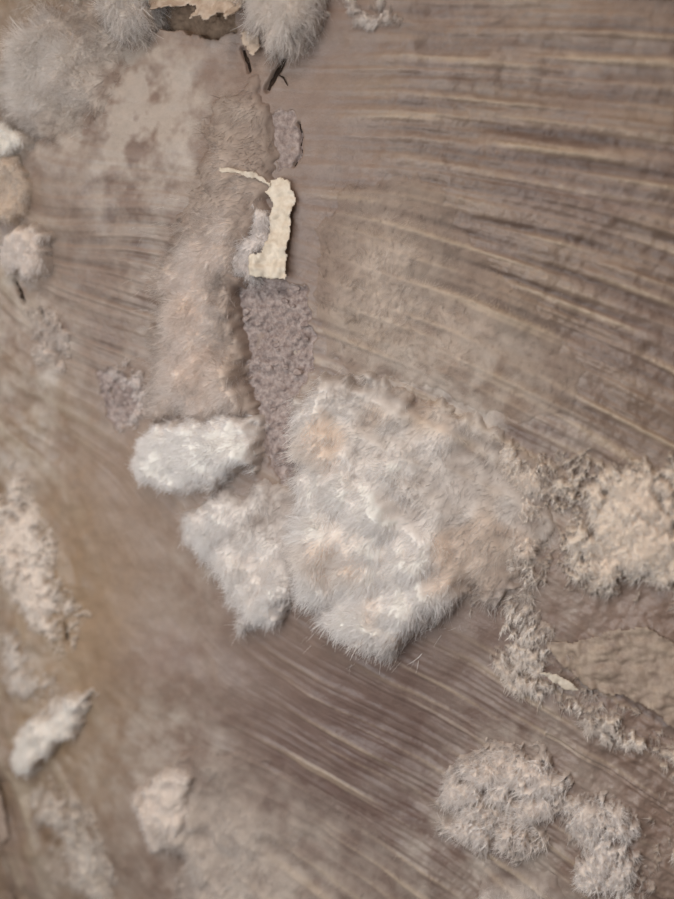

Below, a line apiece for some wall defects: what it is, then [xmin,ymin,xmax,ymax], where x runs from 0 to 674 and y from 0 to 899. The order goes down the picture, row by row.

spalling [148,0,260,56]
leakage [230,0,332,72]
leakage [0,0,172,284]
leakage [24,291,74,374]
spalling [239,278,317,485]
leakage [105,74,674,799]
leakage [0,457,118,899]
peeling [540,627,674,728]
leakage [123,739,433,899]
leakage [428,737,674,899]